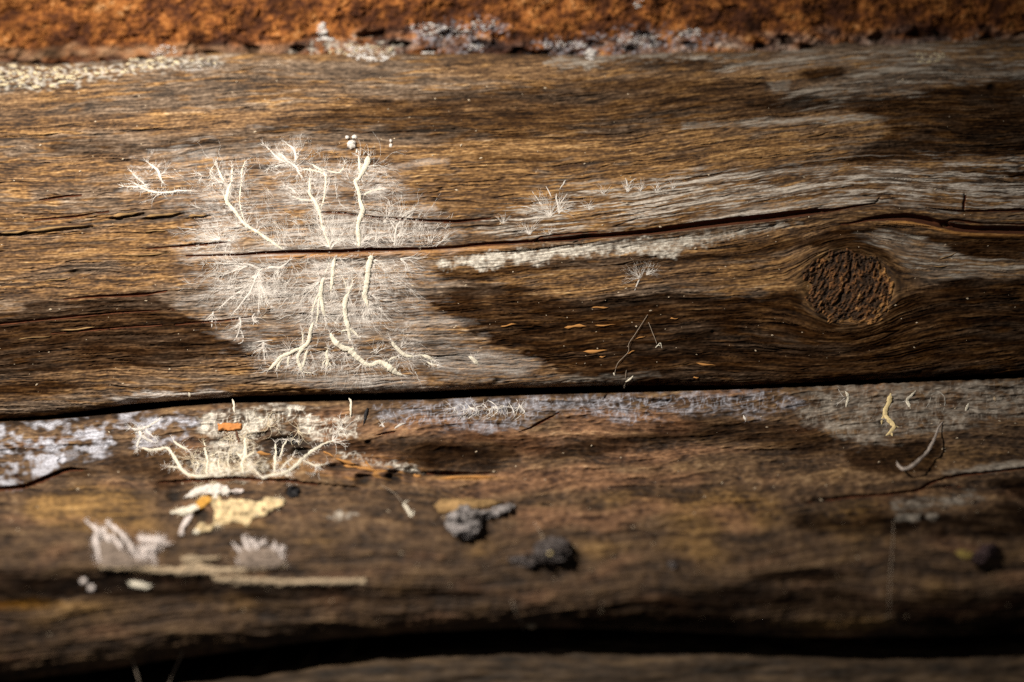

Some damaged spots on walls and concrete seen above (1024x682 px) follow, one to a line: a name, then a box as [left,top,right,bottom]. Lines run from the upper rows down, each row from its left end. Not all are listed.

crack [147,193,1024,257]
leakage [0,133,1024,448]
leakage [0,421,114,486]
leakage [118,391,359,477]